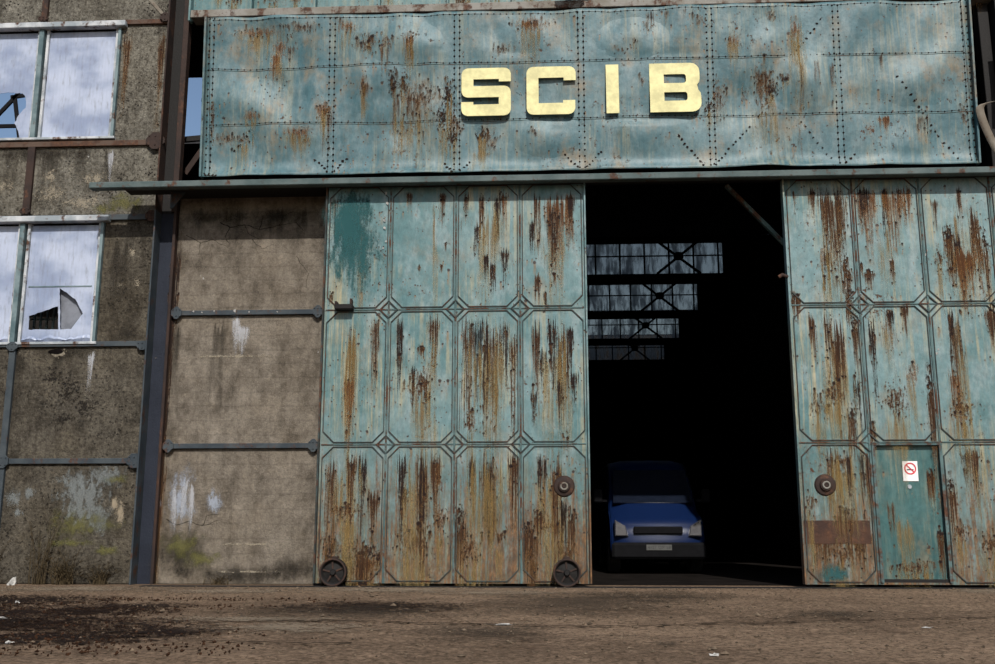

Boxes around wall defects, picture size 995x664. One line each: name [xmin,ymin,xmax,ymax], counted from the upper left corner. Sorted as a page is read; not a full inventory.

rust [234,21,322,81]
rust [316,102,333,155]
rust [339,17,466,153]
rust [475,126,501,158]
rust [508,13,557,47]
rust [742,53,789,127]
rust [433,192,447,281]
rust [461,192,509,292]
rust [528,190,575,305]
rust [791,185,995,587]
rust [320,313,579,586]
peeling [57,465,124,530]